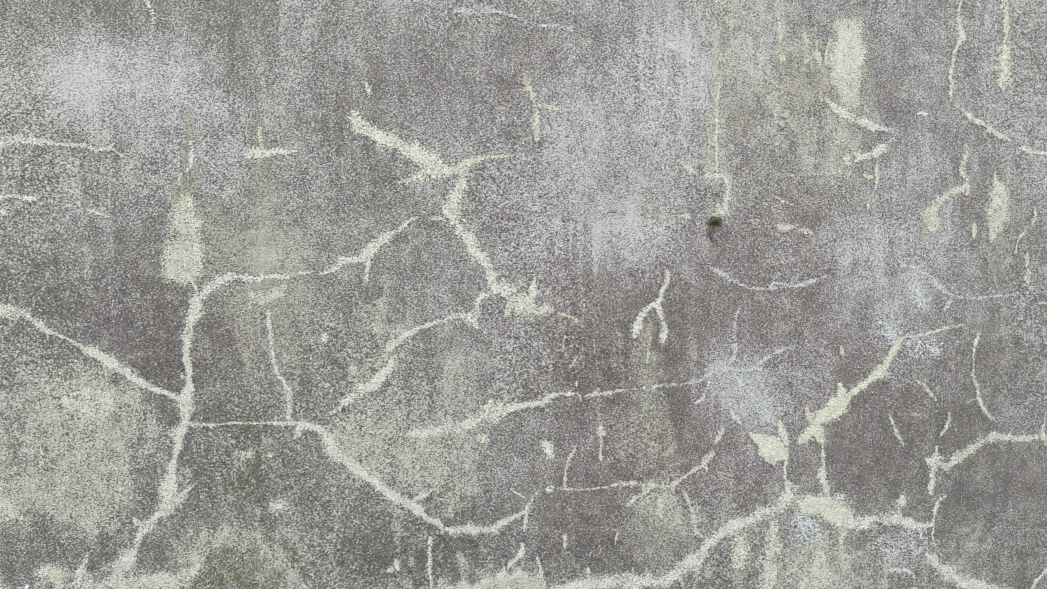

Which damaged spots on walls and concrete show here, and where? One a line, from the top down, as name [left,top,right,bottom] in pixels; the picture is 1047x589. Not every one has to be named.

crack [144,0,157,31]
crack [522,71,563,142]
crack [638,75,738,229]
crack [780,97,898,211]
crack [919,0,1047,256]
crack [0,108,800,589]
crack [797,323,1047,589]